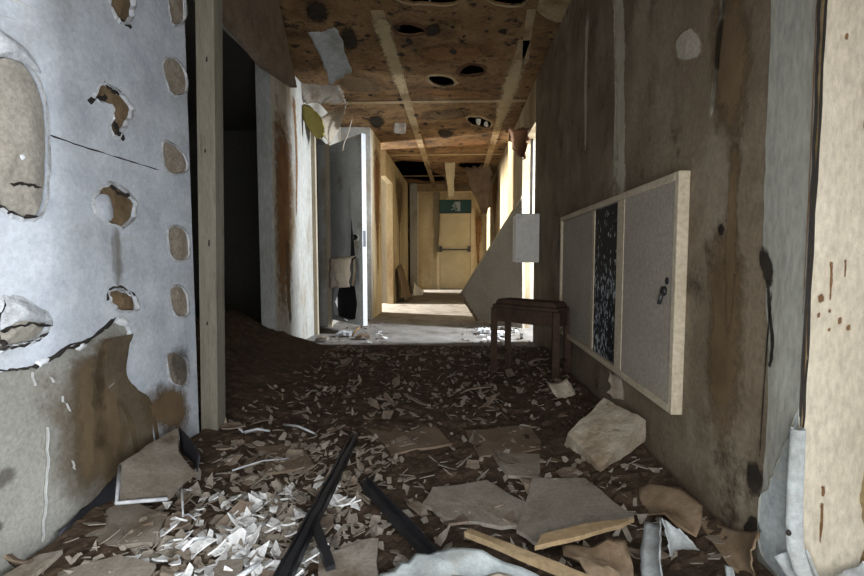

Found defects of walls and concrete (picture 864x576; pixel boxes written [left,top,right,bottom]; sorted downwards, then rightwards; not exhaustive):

peeling [108,0,137,29]
peeling [0,30,52,223]
peeling [87,81,135,141]
peeling [0,295,53,355]
corrosion [817,262,850,331]